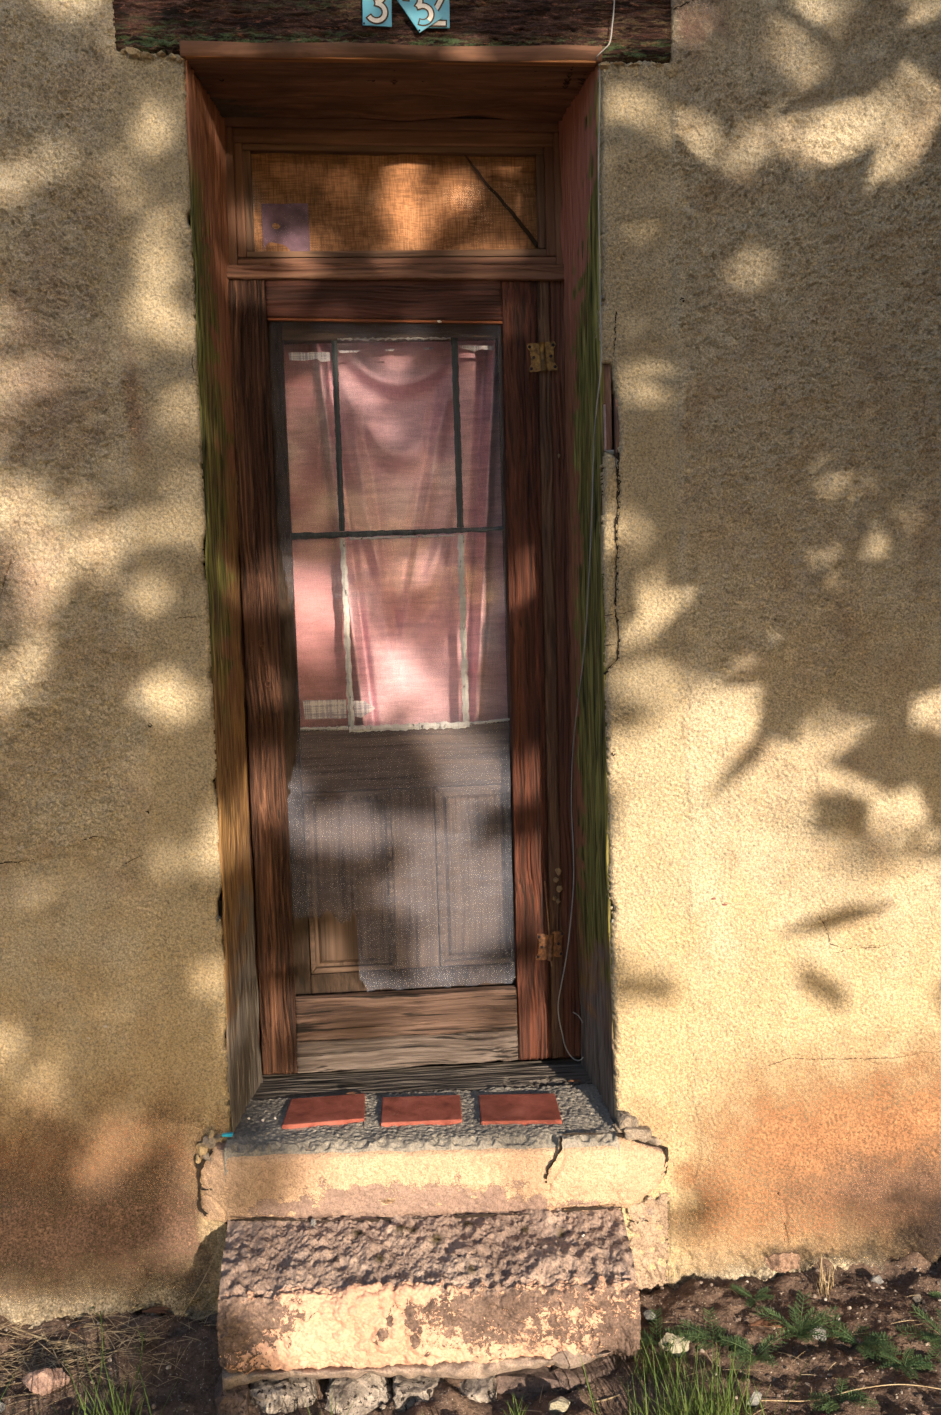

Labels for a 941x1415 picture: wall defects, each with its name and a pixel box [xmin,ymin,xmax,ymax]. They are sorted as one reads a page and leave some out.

crack [603,452,636,675]
damp [0,1116,213,1327]
peeling [195,1111,671,1375]
crack [197,1131,670,1281]
damp [682,1058,941,1283]